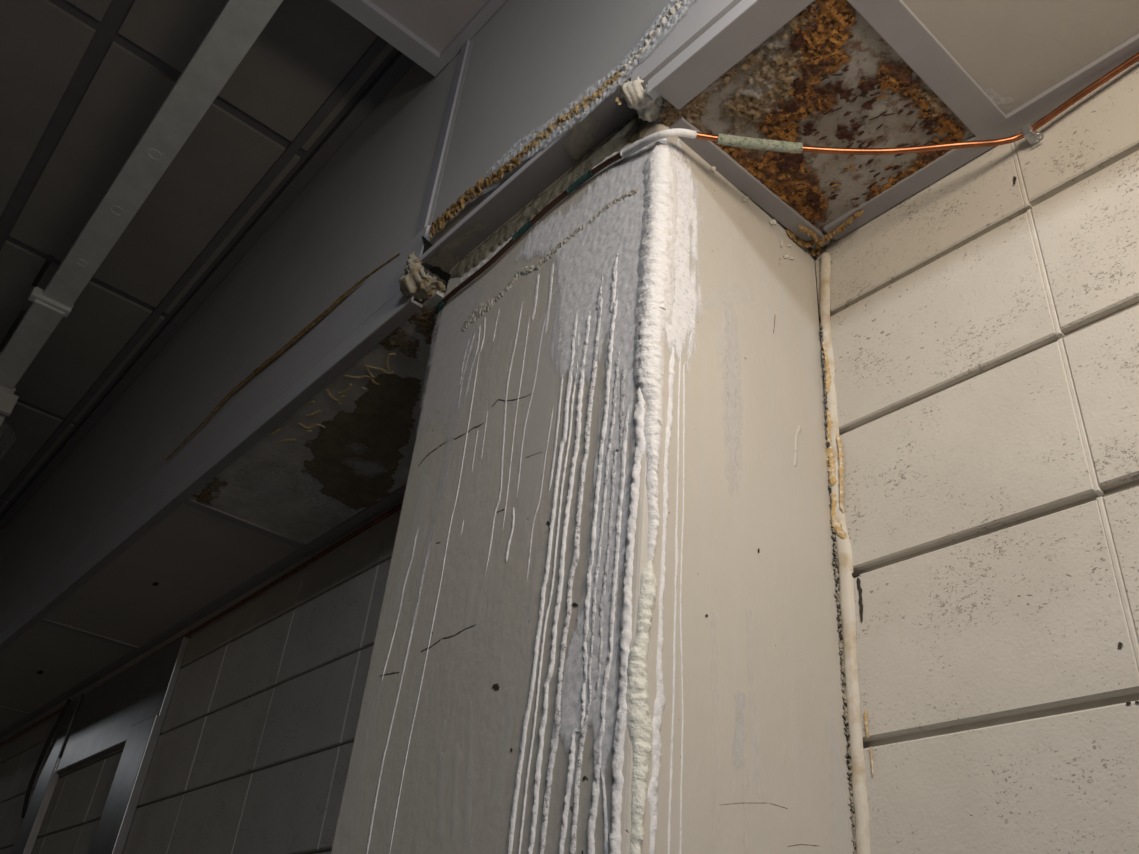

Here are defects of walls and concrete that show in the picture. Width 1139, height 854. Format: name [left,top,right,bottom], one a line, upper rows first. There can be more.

rust [659,0,966,257]
damp [241,353,421,512]
crack [421,624,477,652]